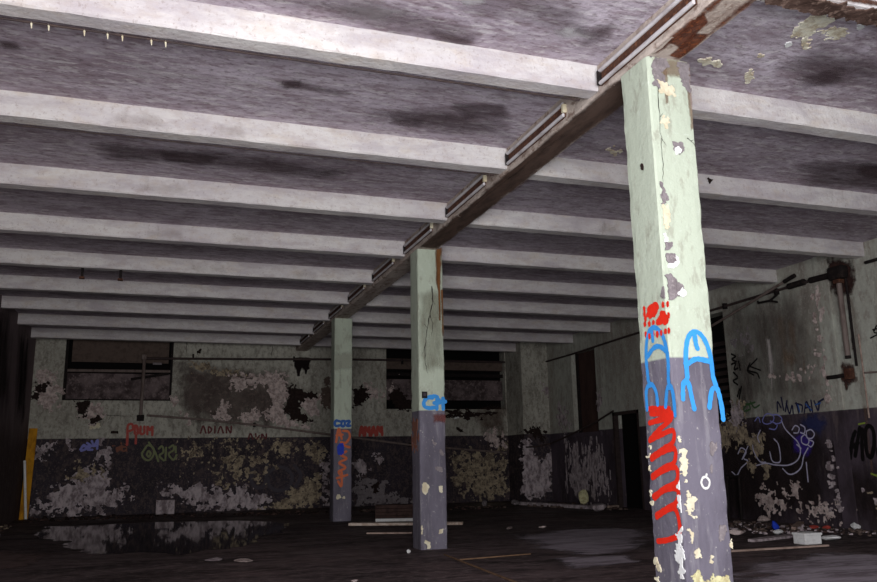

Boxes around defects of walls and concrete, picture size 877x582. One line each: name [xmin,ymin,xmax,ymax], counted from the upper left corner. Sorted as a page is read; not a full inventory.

leakage [394,105,502,128]
peeling [650,56,723,97]
corrosion [656,0,753,82]
spalling [760,0,877,50]
corrosion [422,81,624,335]
spalling [659,181,687,300]
peeling [157,349,419,512]
peeling [422,408,553,502]
peeling [564,435,612,504]
peeling [674,436,730,582]
peeling [719,525,733,549]
peeling [709,399,844,526]